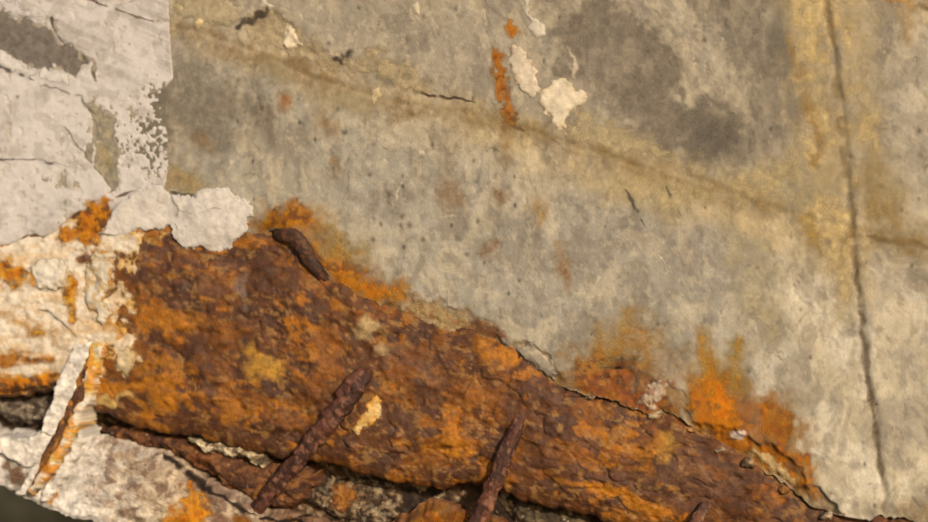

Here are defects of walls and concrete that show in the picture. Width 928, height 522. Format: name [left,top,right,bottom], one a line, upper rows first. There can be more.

peeling [0,0,85,85]
crack [421,91,475,103]
corrosion [491,48,517,134]
peeling [0,88,253,378]
crack [170,191,195,241]
crack [625,188,646,227]
corrosion [0,257,35,290]
corrosion [0,351,60,397]
corrosion [58,196,871,522]
spalling [0,385,56,431]
spalling [94,401,289,501]
spalling [270,460,483,522]